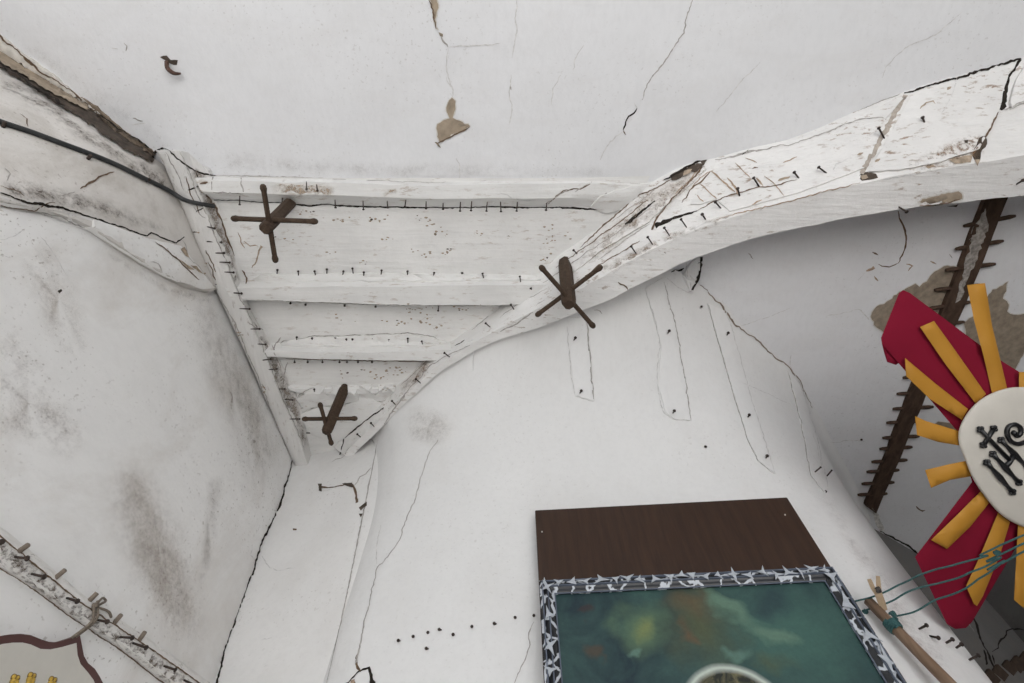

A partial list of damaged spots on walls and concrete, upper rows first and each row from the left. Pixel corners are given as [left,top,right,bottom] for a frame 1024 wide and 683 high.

flaking render [0,34,156,162]
flaking render [435,97,470,148]
crack [441,2,518,124]
crack [600,0,693,160]
crack [263,58,1024,332]
spalling [917,190,964,207]
crack [0,147,596,683]
crack [618,257,865,491]
flaking render [870,209,989,333]
flaking render [963,315,980,345]
flaking render [987,281,1024,370]
crack [880,531,918,554]